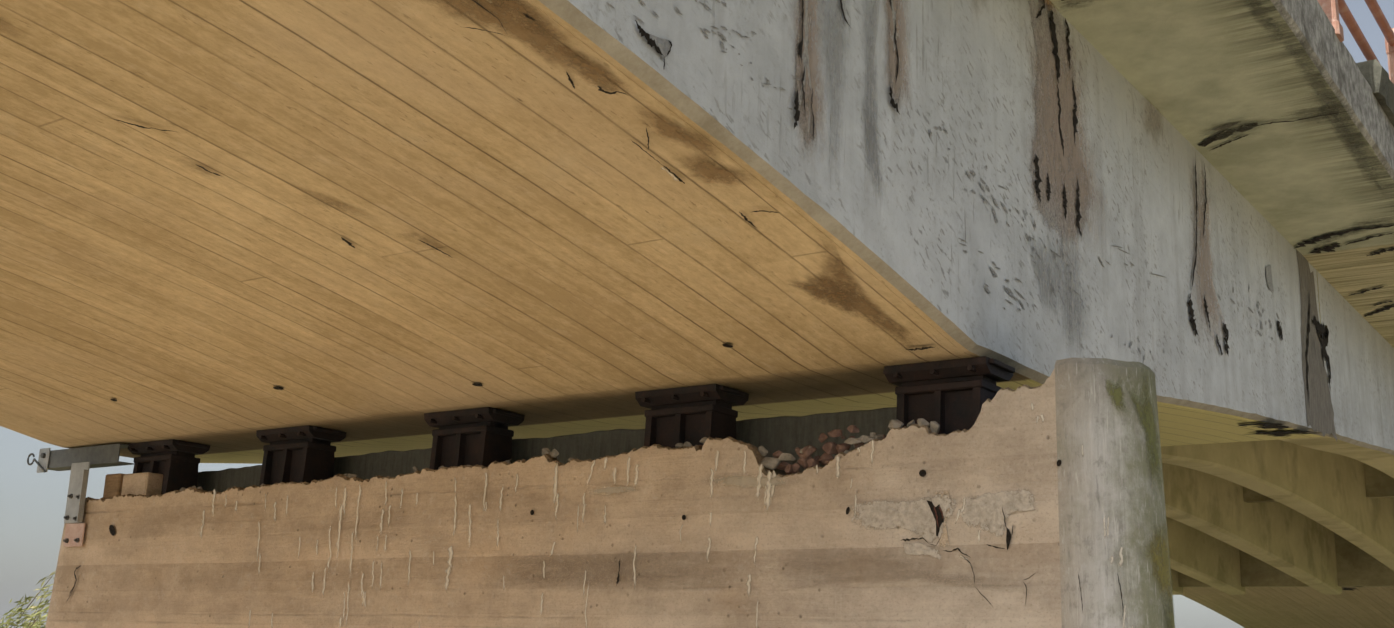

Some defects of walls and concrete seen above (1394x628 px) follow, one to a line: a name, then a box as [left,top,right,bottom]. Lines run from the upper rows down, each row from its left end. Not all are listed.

leakage [441,0,615,89]
leakage [647,115,739,184]
leakage [803,258,904,337]
leakage [710,451,780,508]
spalling [758,418,940,475]
leakage [298,482,418,628]
leakage [433,473,518,588]
spalling [851,489,1035,560]
crack [943,509,1013,604]